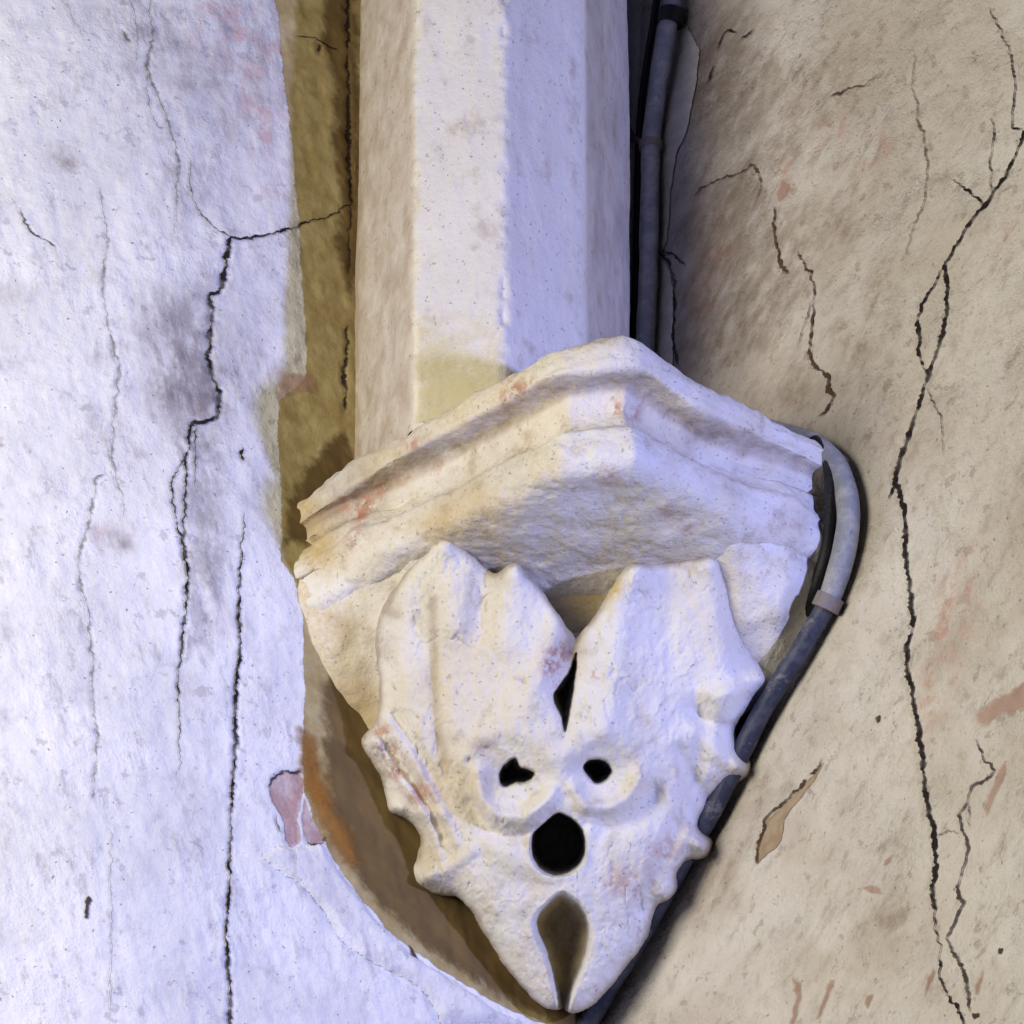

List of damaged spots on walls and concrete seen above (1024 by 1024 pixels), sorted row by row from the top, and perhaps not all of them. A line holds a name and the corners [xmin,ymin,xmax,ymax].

crack [20,212,54,246]
crack [123,0,353,768]
flaking render [274,0,361,589]
crack [697,163,835,415]
crack [832,79,872,96]
crack [888,10,1024,1024]
crack [224,516,246,1024]
flaking render [270,608,555,1024]
spalling [756,761,824,864]